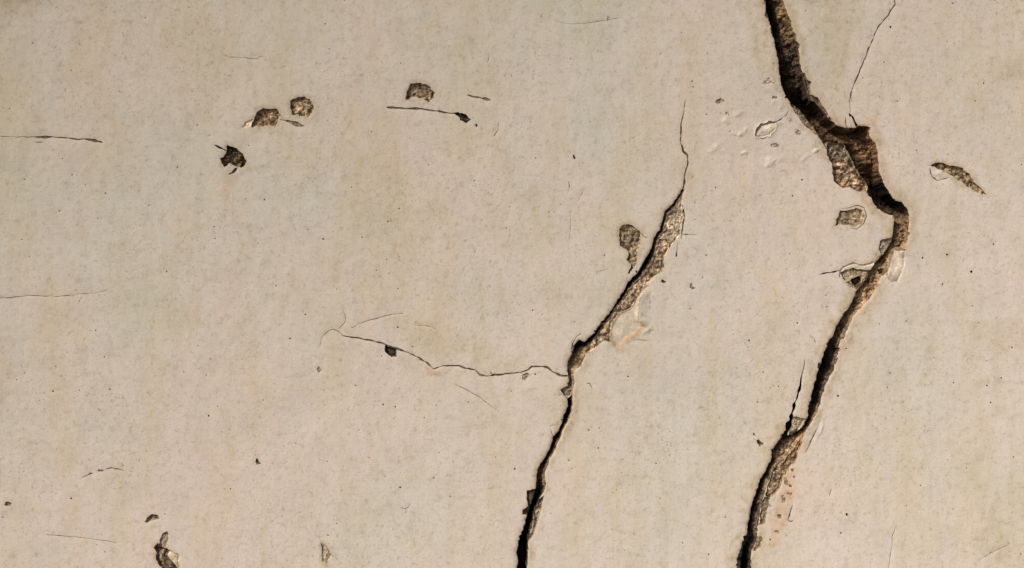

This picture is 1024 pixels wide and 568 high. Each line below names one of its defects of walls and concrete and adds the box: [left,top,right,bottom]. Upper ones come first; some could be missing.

spalling [242,89,320,133]
spalling [398,76,442,106]
crack [386,95,499,136]
spalling [215,139,255,175]
spalling [925,157,992,198]
spalling [828,203,871,233]
spalling [612,217,647,280]
crack [723,0,924,568]
crack [320,105,690,568]
spalling [147,531,181,568]